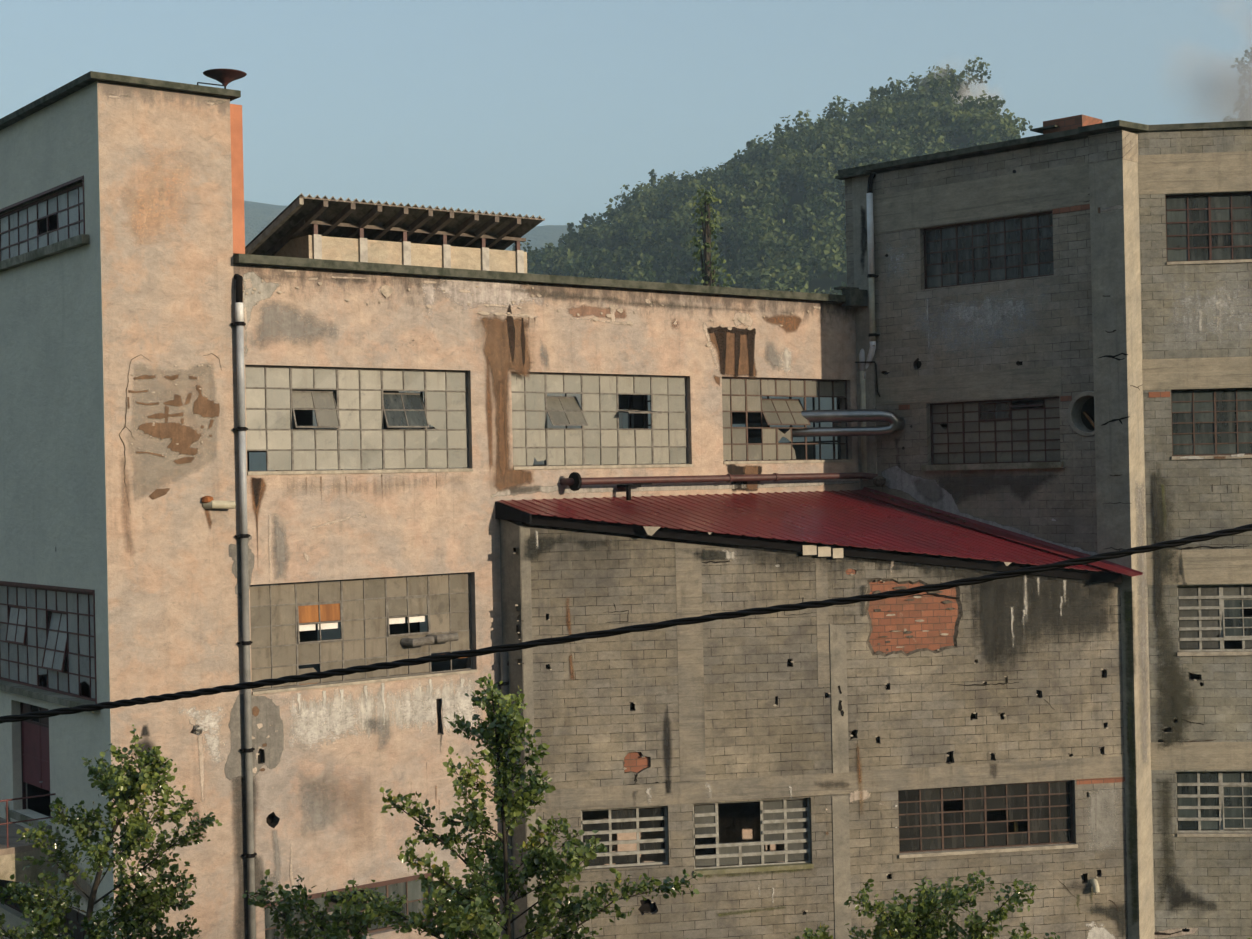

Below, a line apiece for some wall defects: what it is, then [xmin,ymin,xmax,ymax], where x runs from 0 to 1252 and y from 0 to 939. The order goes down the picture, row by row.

peeling [569,305,634,326]
peeling [128,364,220,464]
crack [1099,353,1143,426]
peeling [149,488,170,500]
spalling [846,569,963,657]
water stain [975,578,1039,658]
water stain [1136,469,1191,762]
spalling [623,752,651,774]